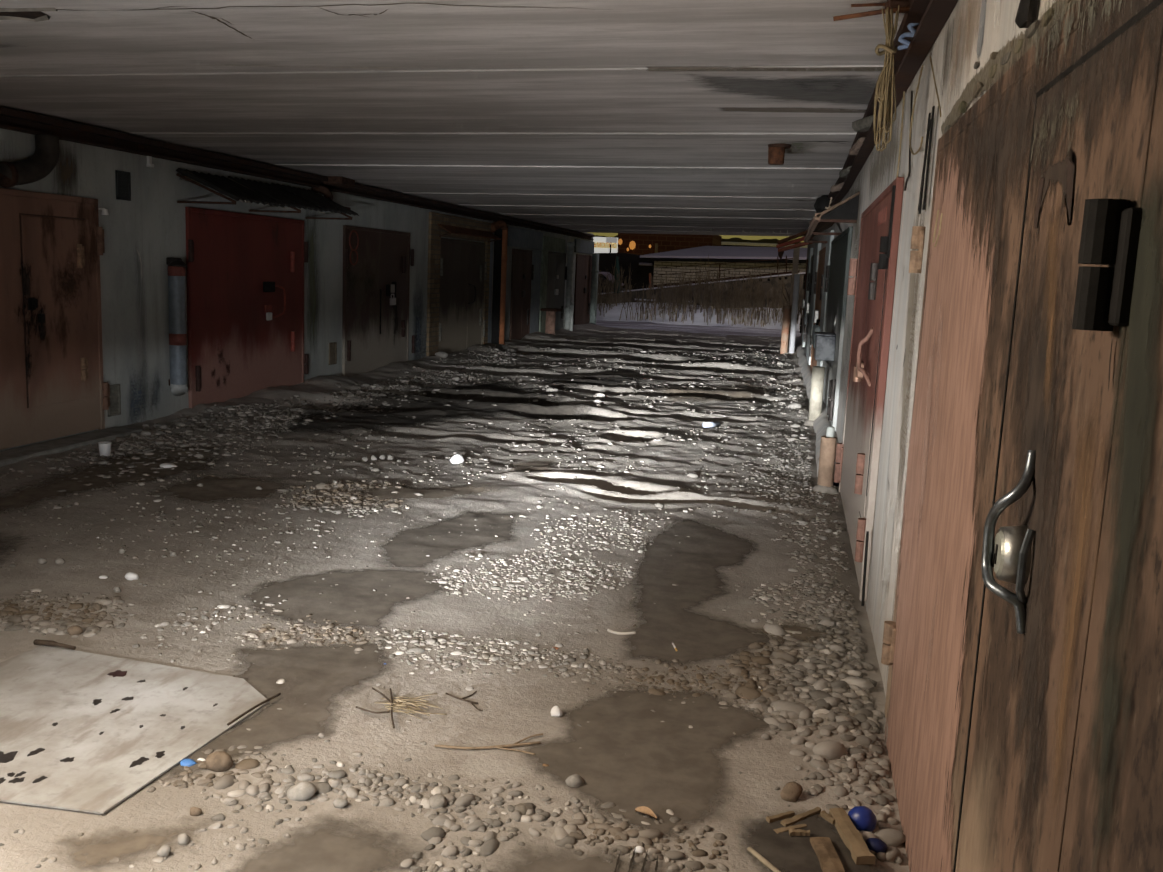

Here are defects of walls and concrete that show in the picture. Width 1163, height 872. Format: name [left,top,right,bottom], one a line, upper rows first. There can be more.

crack [142,3,493,67]
water stain [976,0,986,59]
water stain [692,74,876,104]